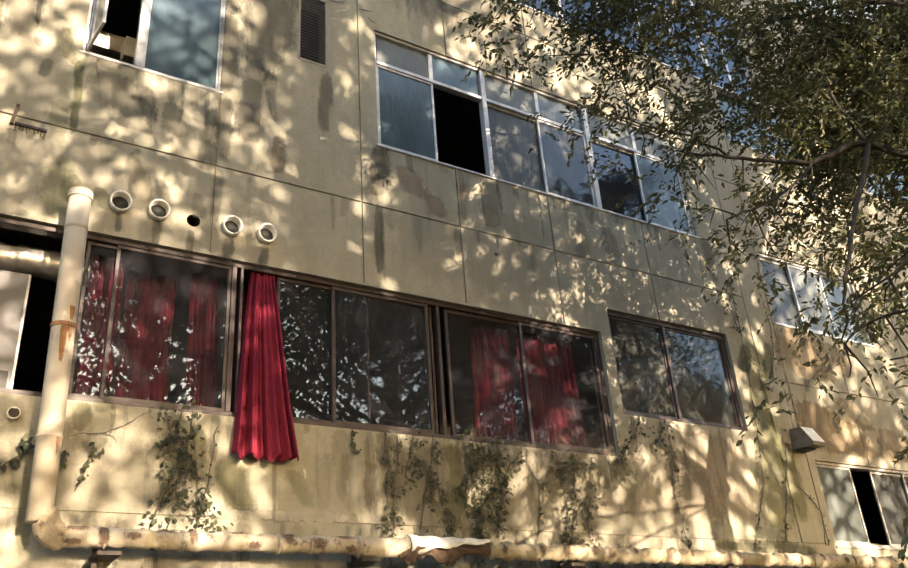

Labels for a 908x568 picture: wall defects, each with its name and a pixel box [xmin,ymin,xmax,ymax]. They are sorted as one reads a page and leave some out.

water stain [370,147,391,195]
water stain [375,208,383,265]
corrosion [59,305,75,361]
water stain [797,401,894,460]
corrosion [63,526,88,544]
corrosion [99,527,110,546]
corrosion [159,529,199,543]
corrosion [313,536,357,552]